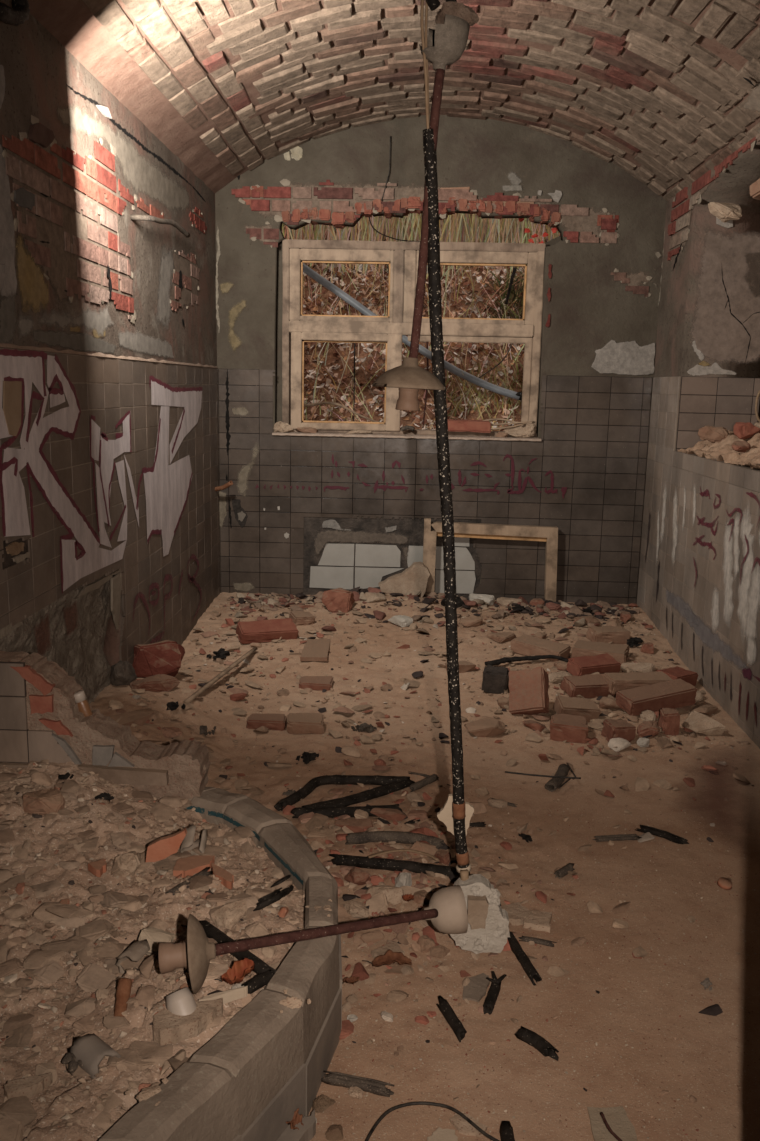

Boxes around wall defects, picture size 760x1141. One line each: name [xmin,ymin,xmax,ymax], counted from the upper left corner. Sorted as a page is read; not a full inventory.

peeling [96,105,112,119]
crack [66,84,206,202]
spalling [0,115,164,325]
spalling [232,179,424,248]
spalling [438,187,620,246]
spalling [667,133,760,261]
spalling [170,250,200,312]
peeling [687,341,736,376]
crack [722,273,760,365]
spalling [0,569,135,783]